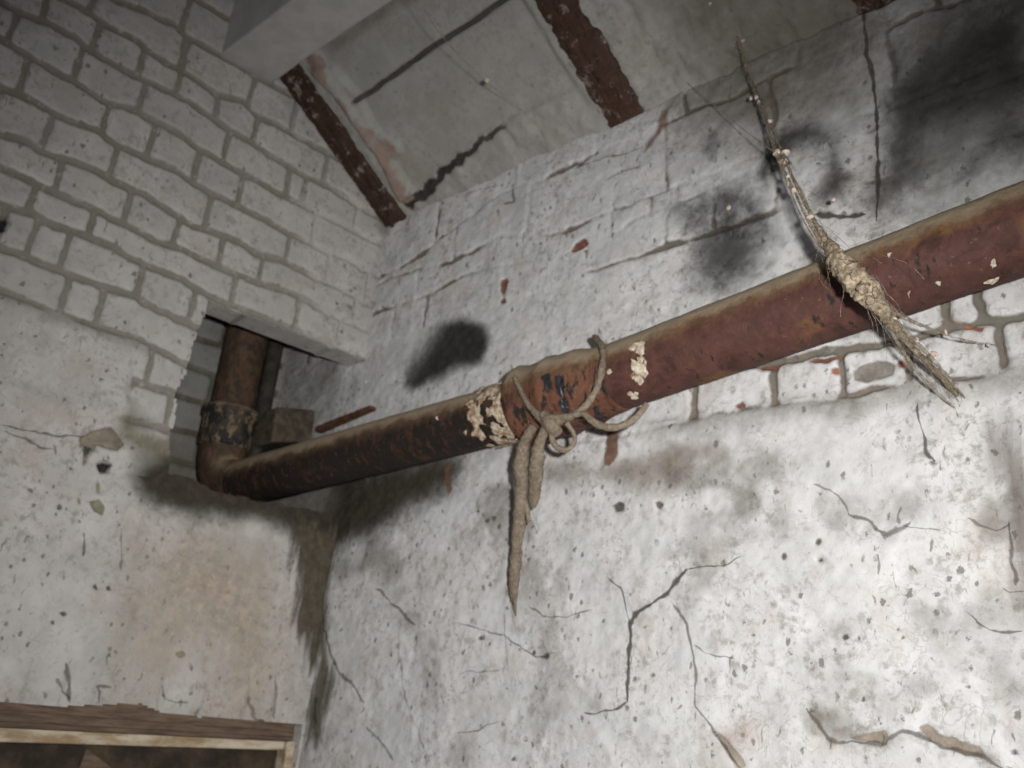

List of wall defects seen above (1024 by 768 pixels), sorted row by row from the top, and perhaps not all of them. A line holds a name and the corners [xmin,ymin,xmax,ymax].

crack [814,13,881,221]
peeling [55,427,123,515]
leakage [138,457,460,748]
crack [584,556,741,714]